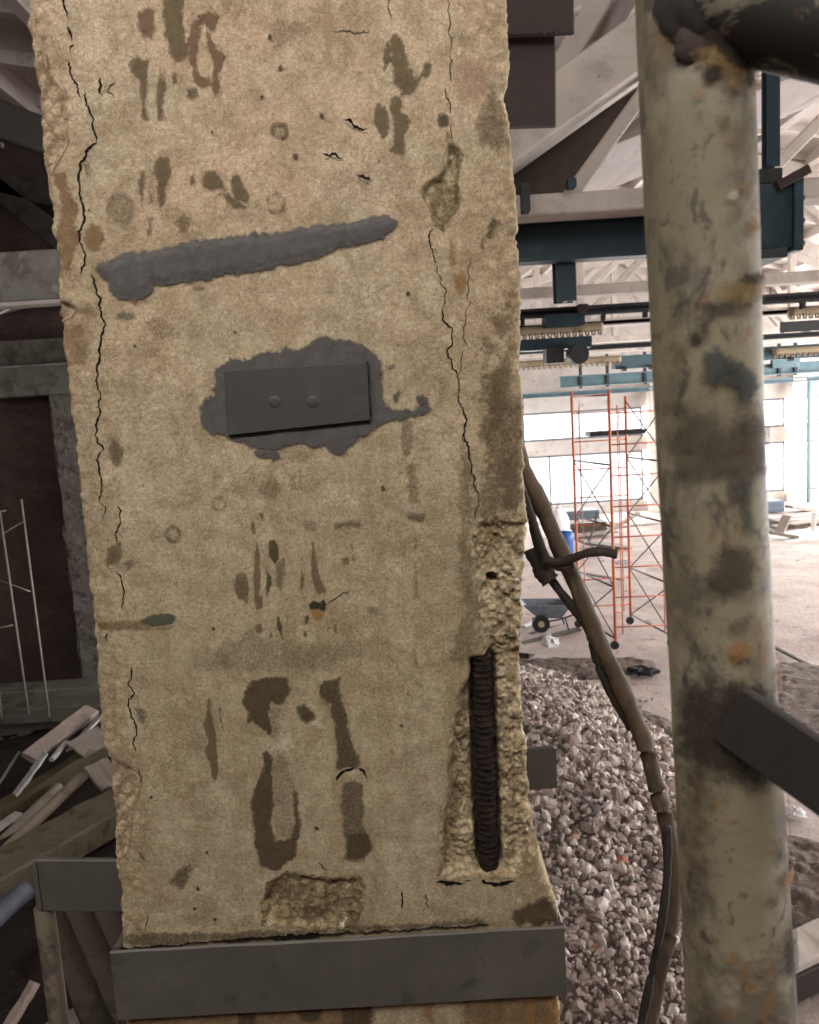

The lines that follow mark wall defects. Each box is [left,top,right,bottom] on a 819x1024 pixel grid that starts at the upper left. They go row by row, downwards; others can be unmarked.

water stain [129,0,226,120]
water stain [374,34,431,154]
rust [700,46,760,90]
water stain [190,171,249,208]
crack [62,0,121,542]
crack [428,229,480,520]
crack [127,668,142,782]
water stain [242,677,290,734]
water stain [250,751,301,870]
crack [336,767,367,780]
spalling [437,515,538,880]
spalling [259,872,366,932]